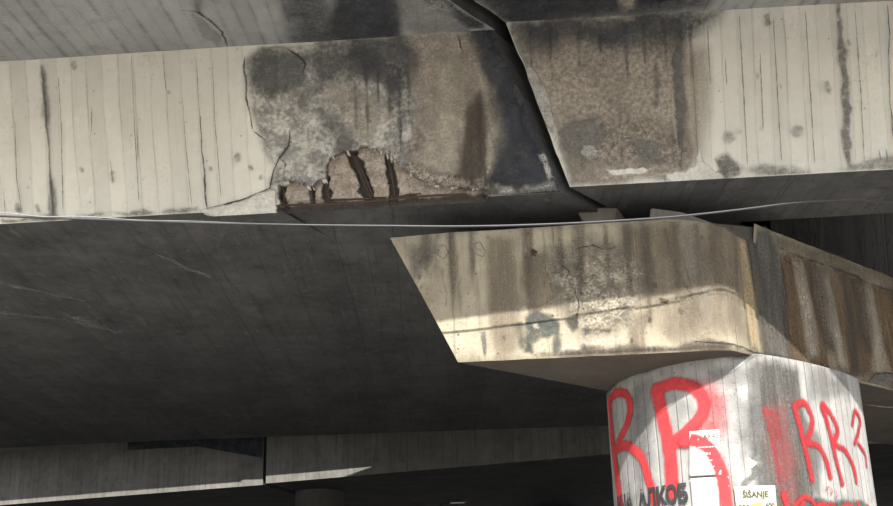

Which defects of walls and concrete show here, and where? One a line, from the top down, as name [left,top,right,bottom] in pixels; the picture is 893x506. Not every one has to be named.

damp [286,0,416,109]
peeling [243,0,556,213]
damp [424,0,560,192]
damp [477,0,707,21]
damp [671,48,686,166]
crack [132,125,140,199]
damp [481,239,517,352]
peeling [544,239,645,334]
spalling [541,338,761,357]